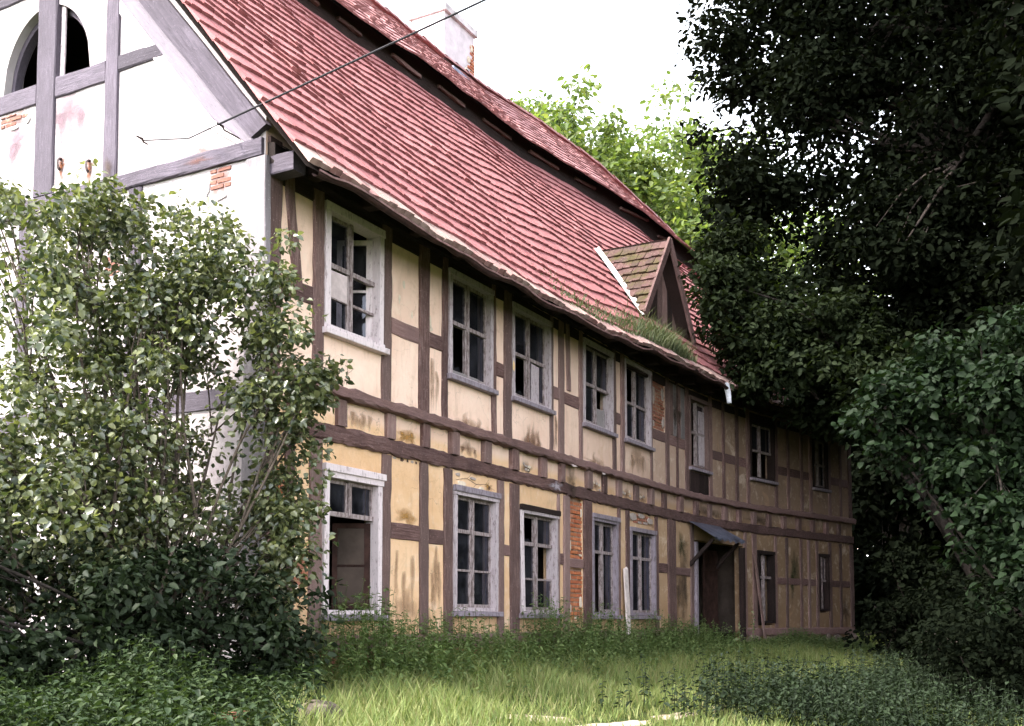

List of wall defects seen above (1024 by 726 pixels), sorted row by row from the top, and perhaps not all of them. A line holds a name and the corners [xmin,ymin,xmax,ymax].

flaking render [0,114,31,131]
flaking render [203,165,231,201]
flaking render [652,381,665,432]
flaking render [570,498,582,620]